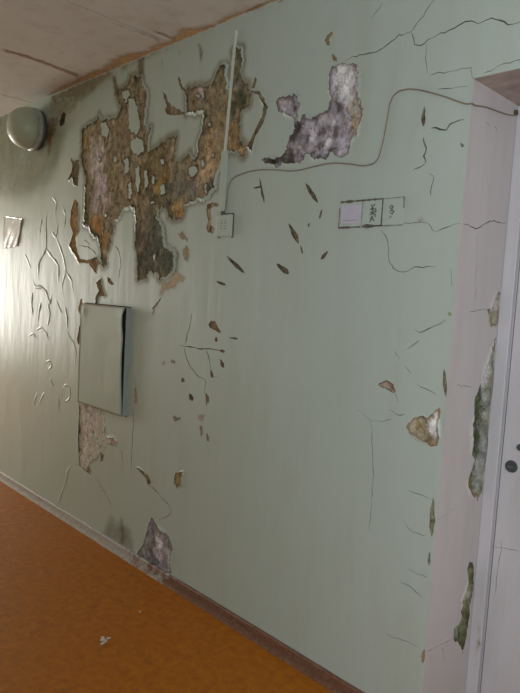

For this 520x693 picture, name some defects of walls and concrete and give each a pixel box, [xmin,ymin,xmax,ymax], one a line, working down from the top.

crack [349,0,520,89]
peeling [67,45,364,304]
crack [381,230,433,272]
spalling [487,290,500,329]
crack [180,315,220,405]
peeling [77,403,118,475]
spalling [406,408,442,447]
spalling [466,338,496,503]
peeling [174,469,185,490]
spalling [135,518,174,574]
spalling [454,562,475,654]